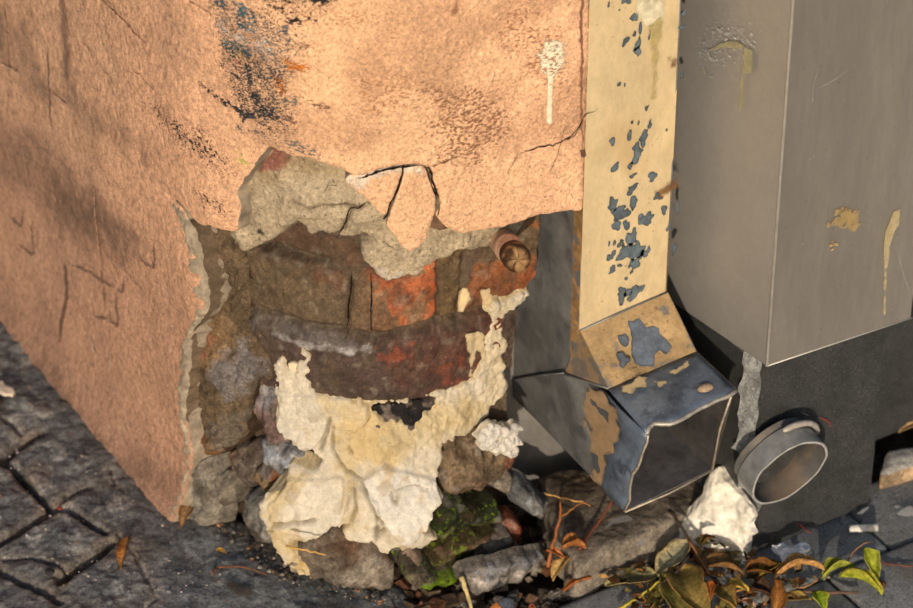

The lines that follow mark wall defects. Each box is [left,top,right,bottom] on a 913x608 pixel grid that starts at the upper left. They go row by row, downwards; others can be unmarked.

peeling [607,0,651,57]
crack [507,112,592,173]
crack [324,156,460,236]
peeling [606,105,679,306]
spalling [167,148,525,519]
peeling [616,318,689,394]
peeling [583,387,620,485]